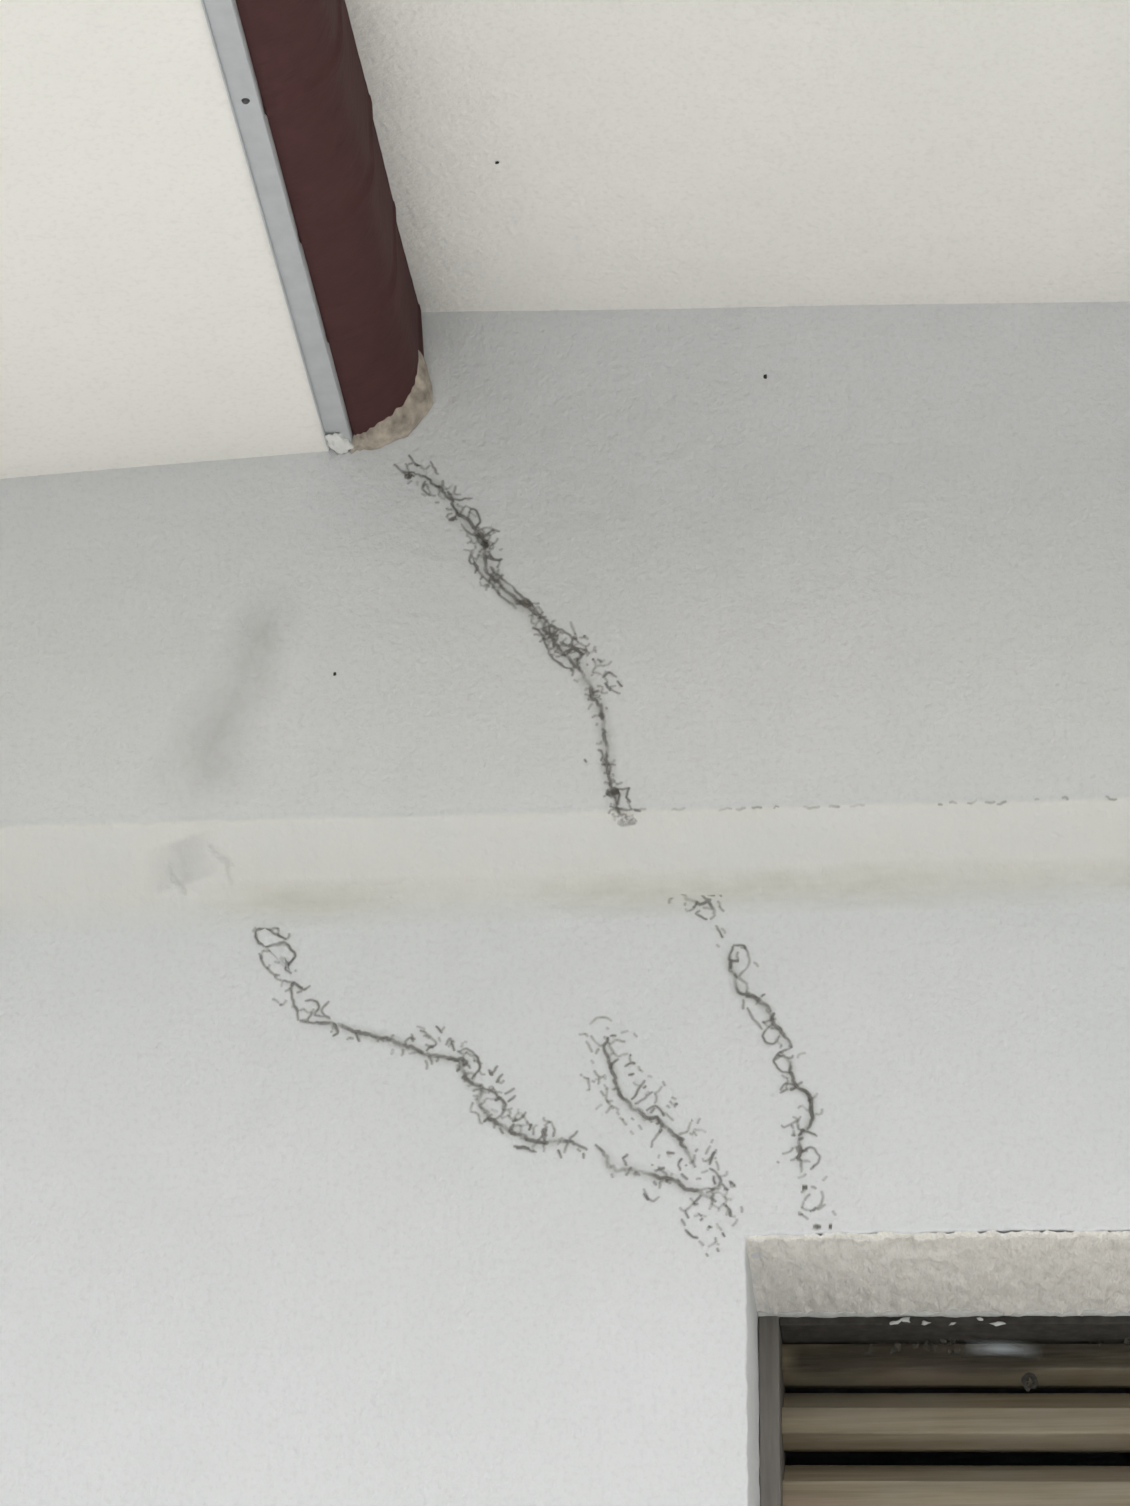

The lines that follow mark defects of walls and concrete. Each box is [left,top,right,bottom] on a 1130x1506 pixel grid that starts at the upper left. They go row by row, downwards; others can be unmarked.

crack [395,455,641,825]
crack [255,928,735,1255]
crack [694,895,820,1190]